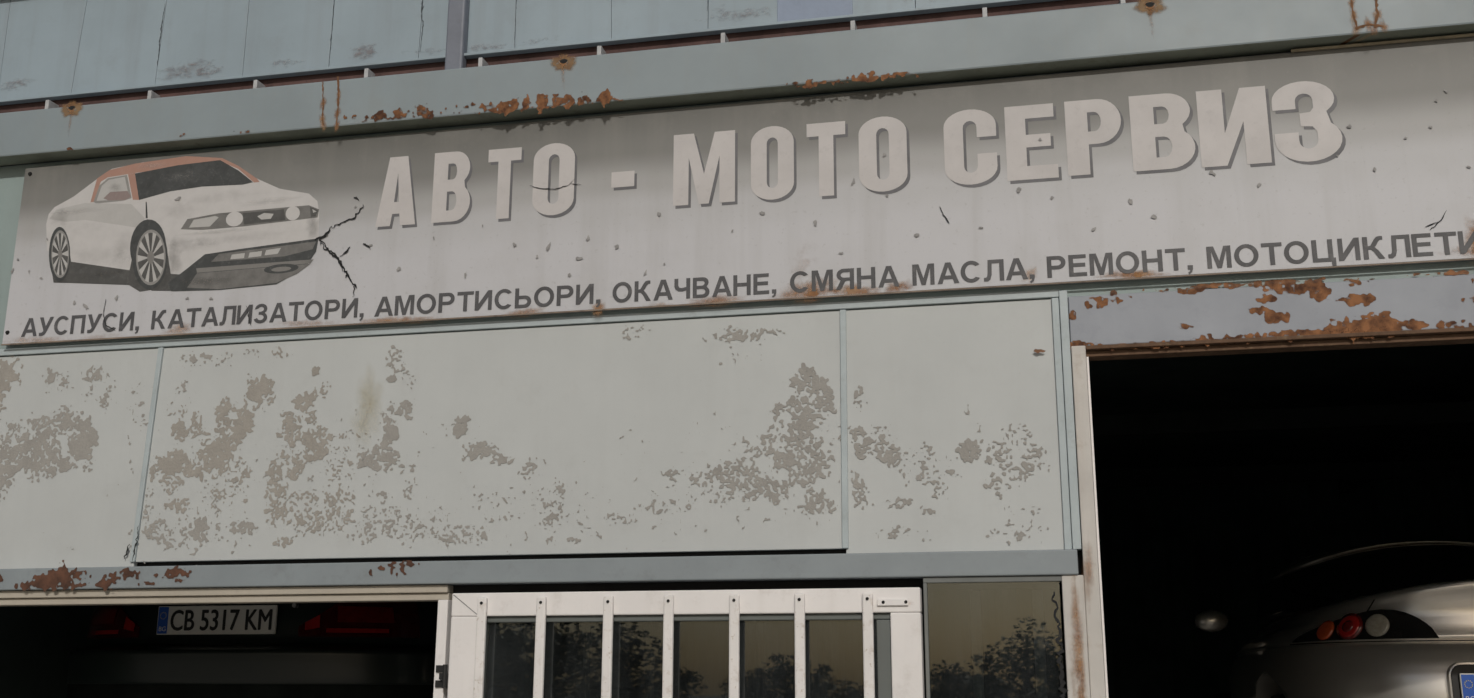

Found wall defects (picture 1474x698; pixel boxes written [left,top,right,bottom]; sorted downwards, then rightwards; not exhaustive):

rust [1339,0,1386,45]
rust [552,55,575,70]
rust [320,76,623,129]
crack [315,197,370,296]
rust [1069,270,1474,351]
peeling [702,325,785,365]
peeling [0,345,1050,555]
rust [0,560,192,592]
rust [369,560,420,576]